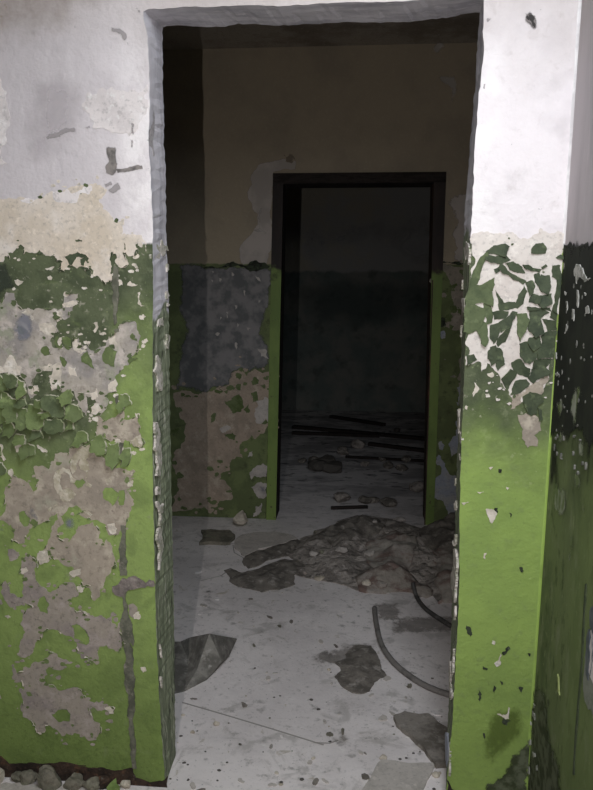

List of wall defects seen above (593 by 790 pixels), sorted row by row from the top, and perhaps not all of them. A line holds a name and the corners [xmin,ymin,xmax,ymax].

peeling [435,228,592,514]
peeling [0,175,269,746]
spalling [486,508,498,523]
spalling [450,534,459,620]
peeling [583,606,593,714]